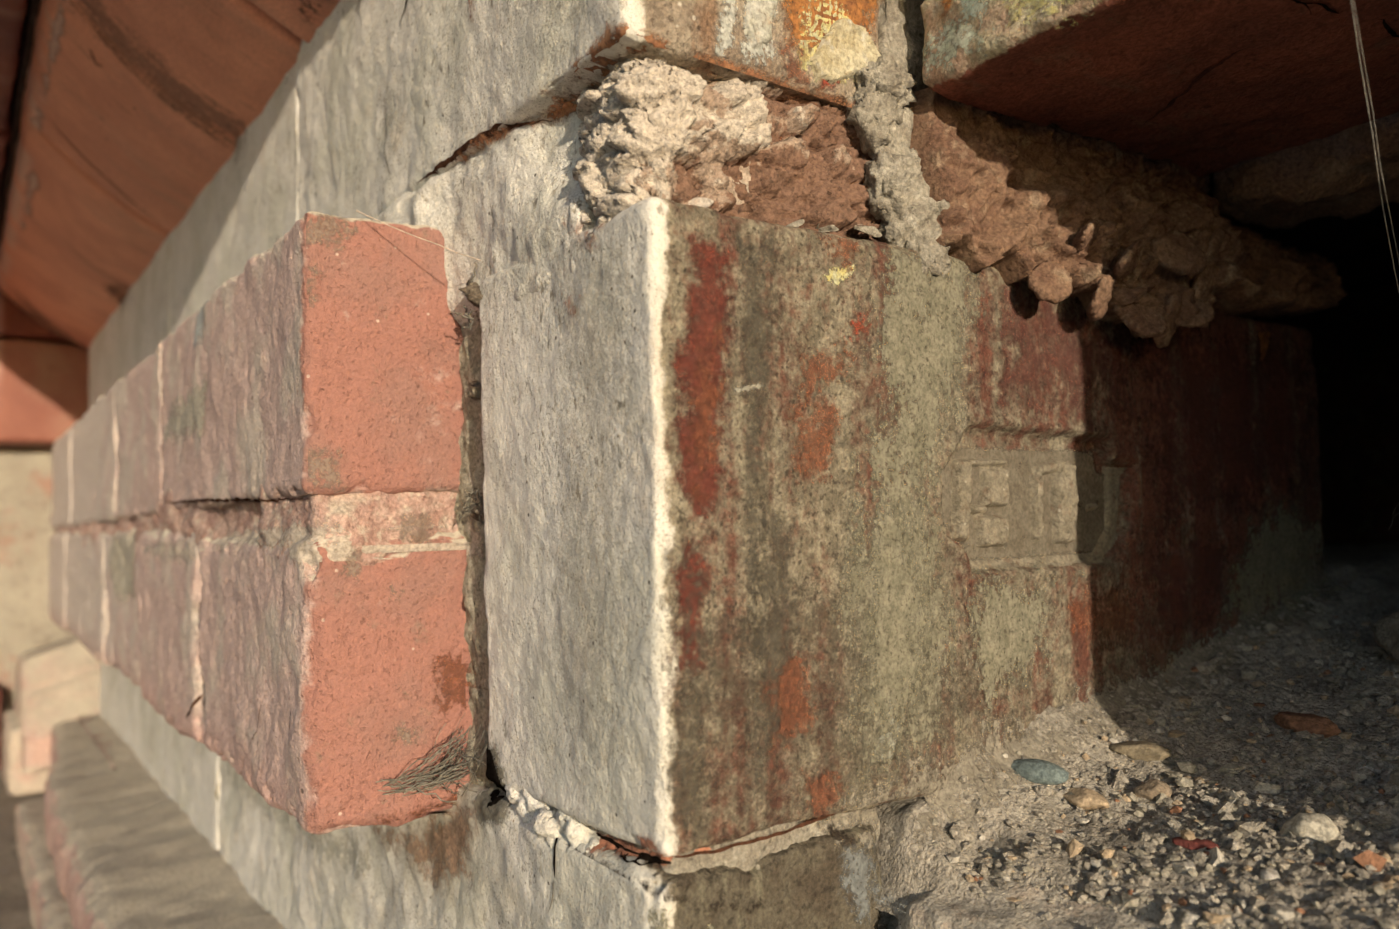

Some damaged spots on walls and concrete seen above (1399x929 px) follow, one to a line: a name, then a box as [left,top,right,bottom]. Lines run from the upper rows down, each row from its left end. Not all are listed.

crack [1292,0,1340,14]
crack [1380,19,1399,37]
crack [384,106,552,183]
peeling [459,127,508,162]
spalling [530,18,886,273]
spalling [909,88,1348,348]
crack [186,602,206,744]
crack [548,813,837,913]